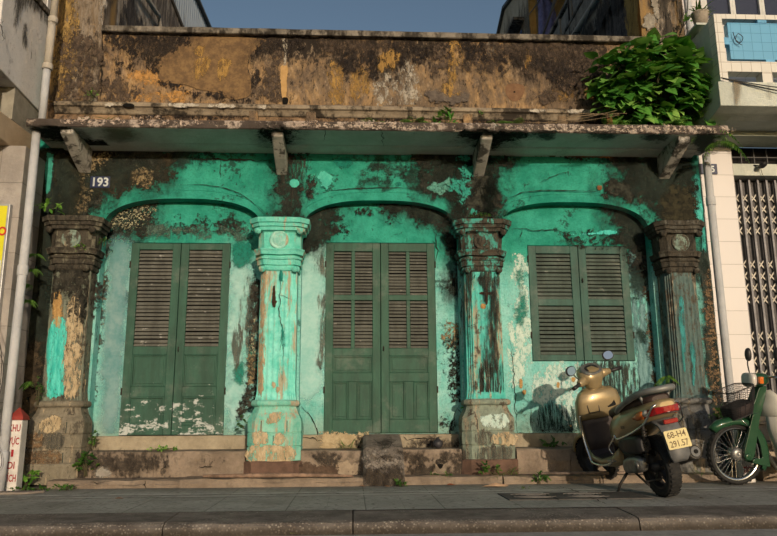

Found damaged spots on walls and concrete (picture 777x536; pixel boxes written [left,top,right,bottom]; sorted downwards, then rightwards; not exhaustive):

leakage [48,0,305,106]
peeling [368,61,420,106]
spalling [46,268,109,401]
leakage [21,125,215,462]
leakage [231,274,260,421]
peeling [257,272,280,399]
leakage [258,125,352,277]
leakage [354,119,617,404]
peeling [514,270,528,325]
leakage [560,130,720,304]
spalling [245,412,406,486]
spalling [475,413,518,460]